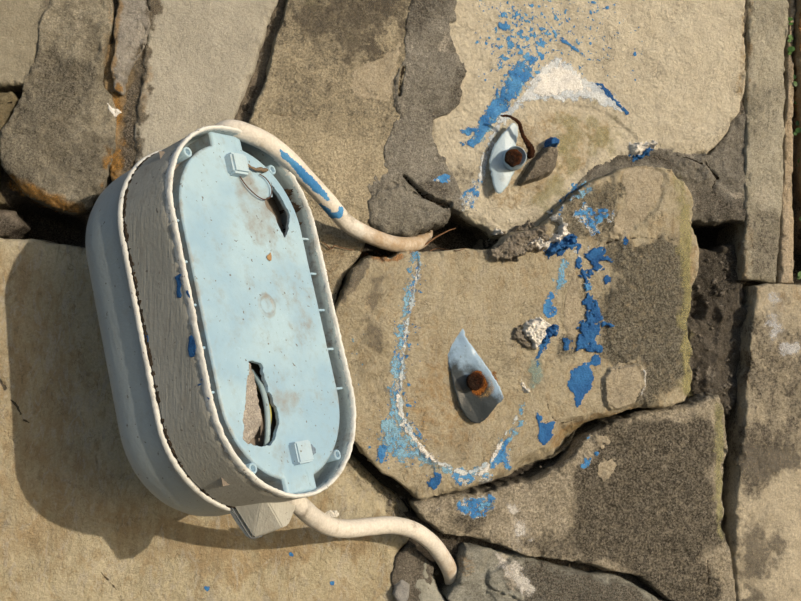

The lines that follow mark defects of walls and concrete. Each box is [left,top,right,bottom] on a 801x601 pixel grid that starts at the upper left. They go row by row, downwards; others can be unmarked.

rust [113,83,123,124]
rust [9,175,80,213]
rust [471,370,497,396]